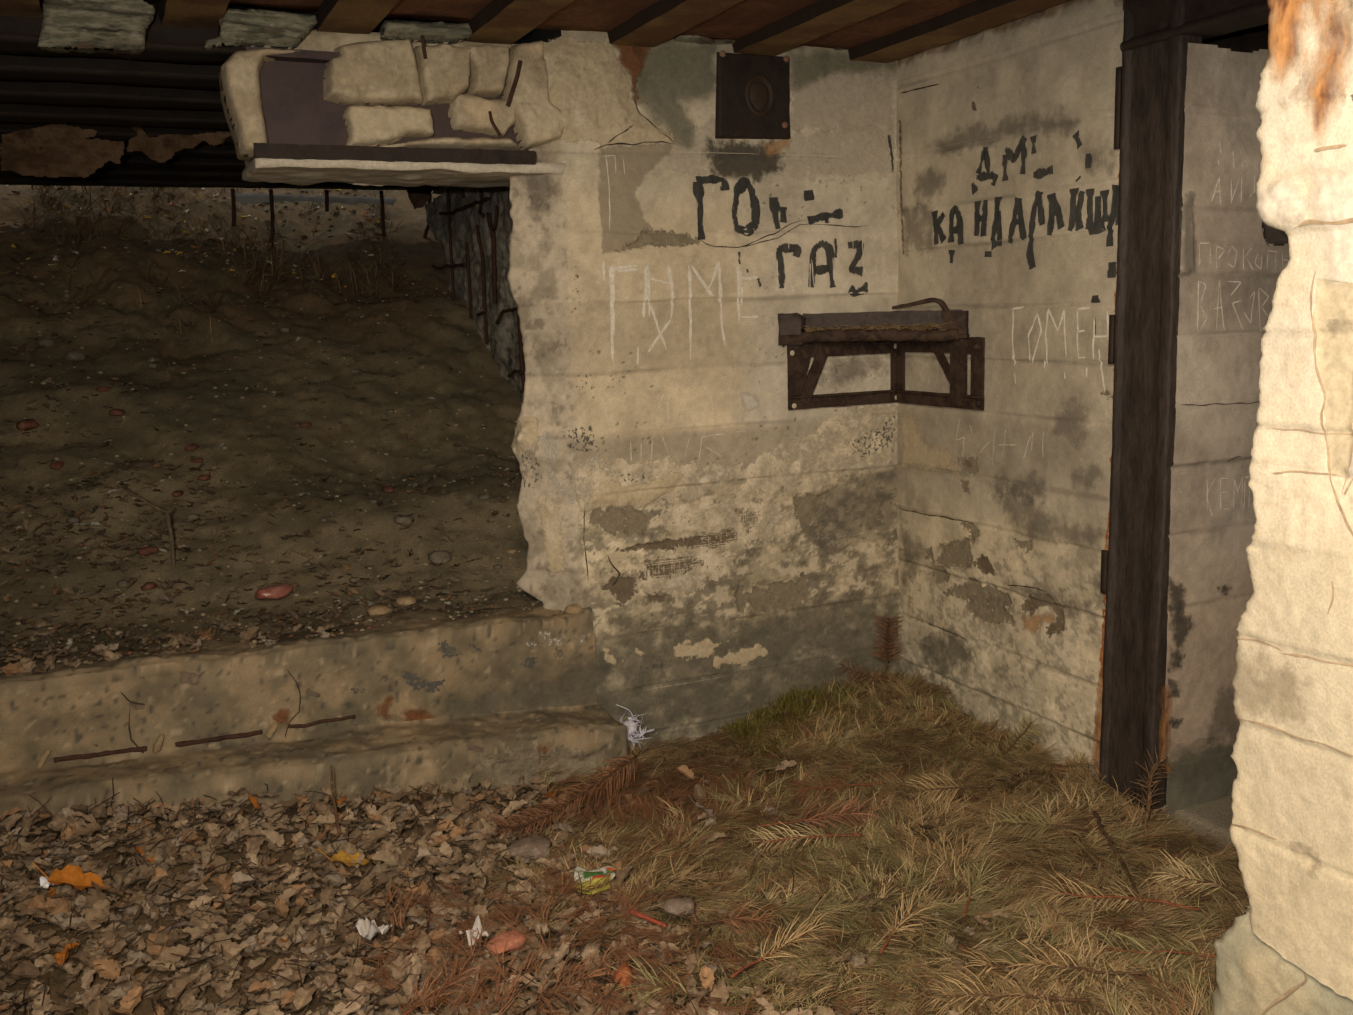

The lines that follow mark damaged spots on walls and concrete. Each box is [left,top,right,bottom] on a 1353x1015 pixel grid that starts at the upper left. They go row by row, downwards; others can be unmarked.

corrosion [1267,0,1319,69]
leakage [636,43,716,146]
leakage [793,53,894,86]
corrosion [1310,16,1348,126]
peeling [562,402,899,614]
peeling [958,456,979,494]
peeling [925,521,1067,638]
peeling [602,648,616,665]
peeling [635,638,768,675]